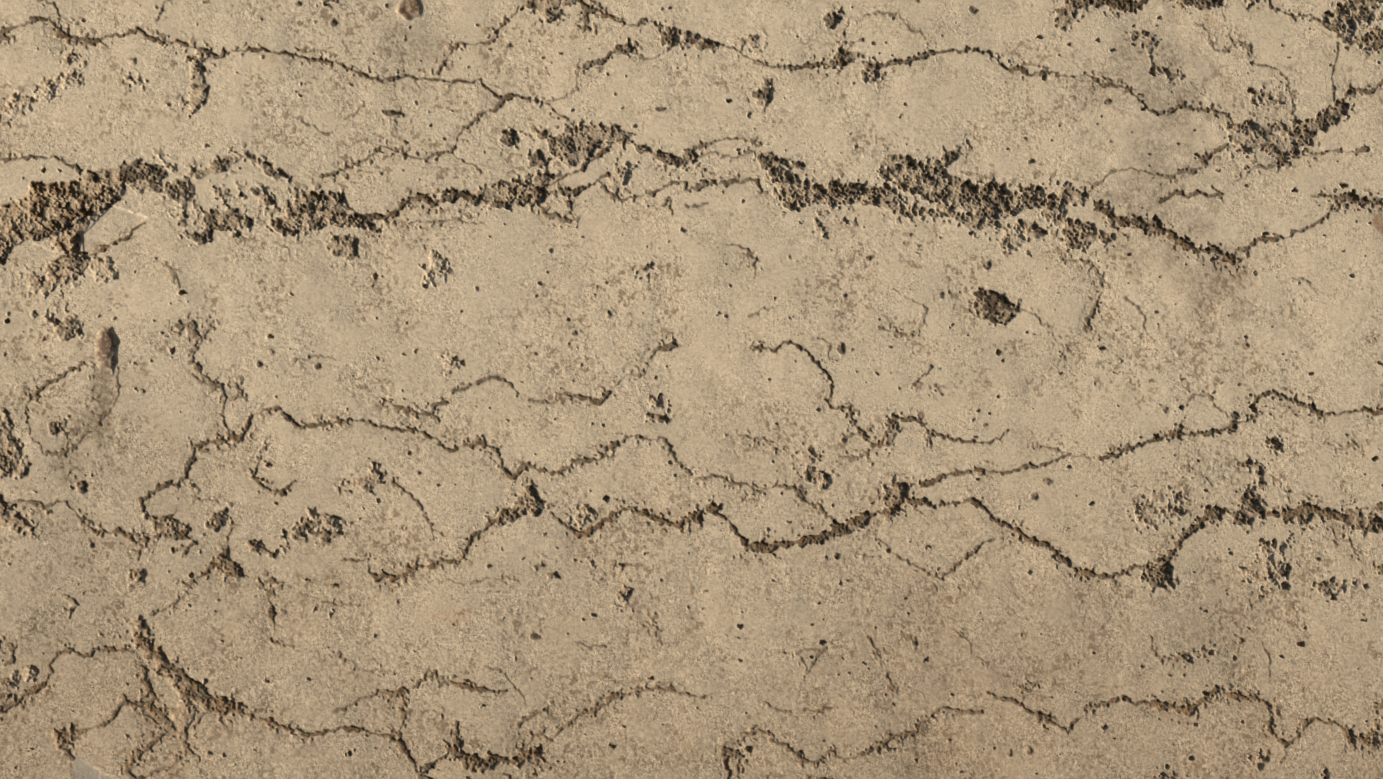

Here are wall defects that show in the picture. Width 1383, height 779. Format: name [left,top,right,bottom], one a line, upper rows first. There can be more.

spalling [465,112,694,217]
spalling [650,100,673,117]
crack [0,0,1383,302]
spalling [750,133,1169,276]
spalling [0,141,377,453]
spalling [0,403,43,541]
spalling [65,472,94,499]
crack [0,239,1383,779]
spalling [55,584,91,621]